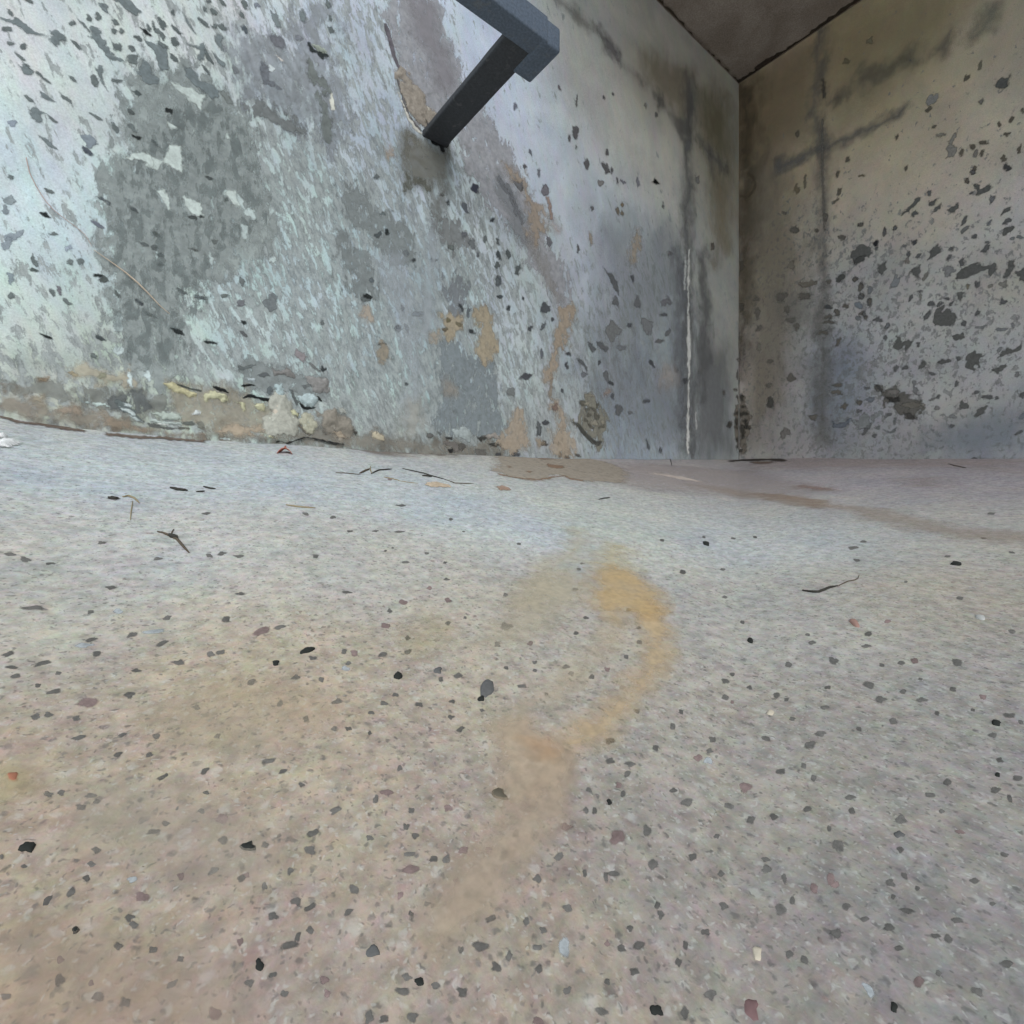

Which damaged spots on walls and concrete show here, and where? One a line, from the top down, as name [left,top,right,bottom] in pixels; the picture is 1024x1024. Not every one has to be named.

spalling [394,66,437,127]
peeling [0,0,354,430]
peeling [333,179,416,302]
peeling [431,193,521,334]
spalling [528,302,554,331]
peeling [584,149,640,187]
water stain [652,61,728,454]
water stain [739,87,791,412]
water stain [775,108,904,230]
peeling [427,337,532,456]
spalling [536,420,580,459]